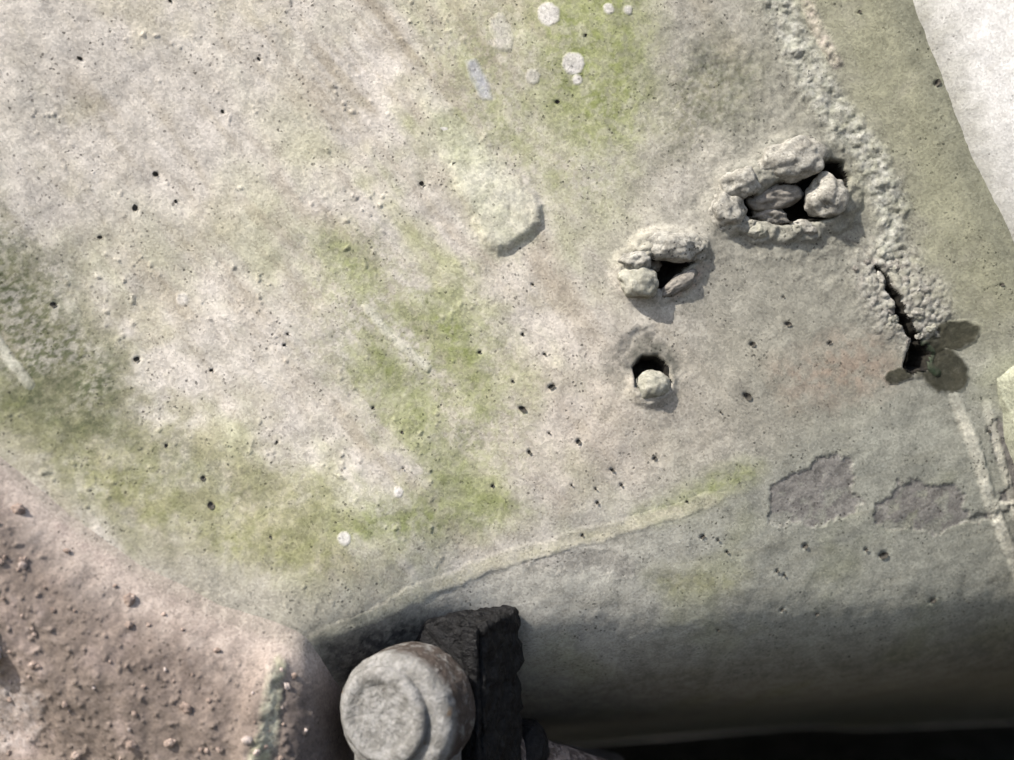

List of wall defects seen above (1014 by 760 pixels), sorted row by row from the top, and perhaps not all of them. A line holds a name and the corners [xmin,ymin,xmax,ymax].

spalling [708,135,849,240]
water stain [0,135,281,506]
spalling [625,326,691,399]
spalling [617,230,706,299]
crack [842,234,921,355]
water stain [884,319,983,396]